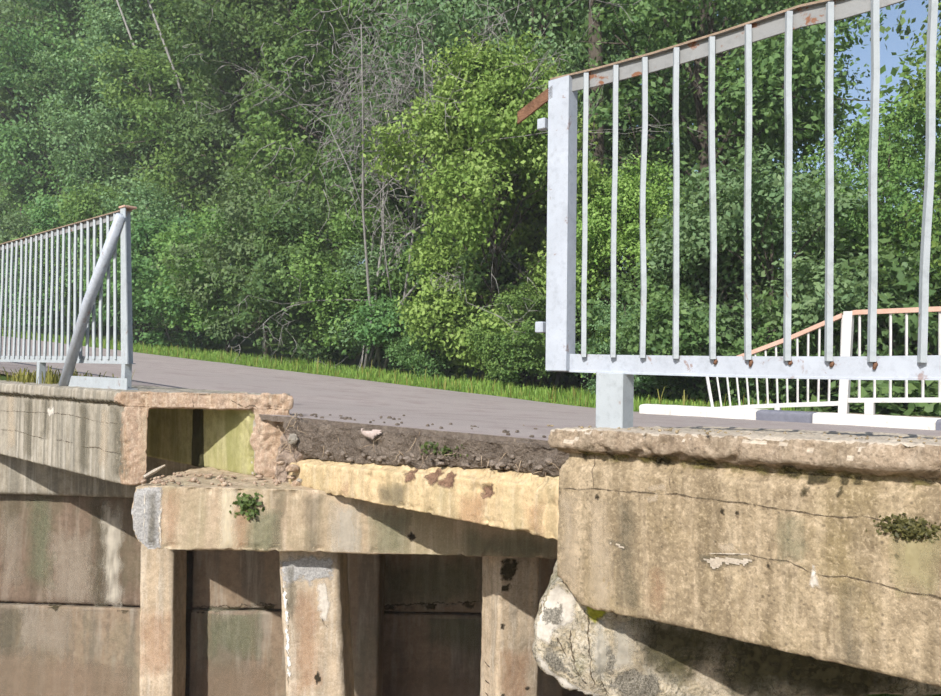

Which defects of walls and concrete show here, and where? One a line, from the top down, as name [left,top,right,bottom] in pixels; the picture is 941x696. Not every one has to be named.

crack [7,407,120,454]
spalling [405,468,456,488]
peeling [131,487,162,549]
peeling [280,556,333,621]
spalling [704,553,752,569]
crack [720,553,941,599]